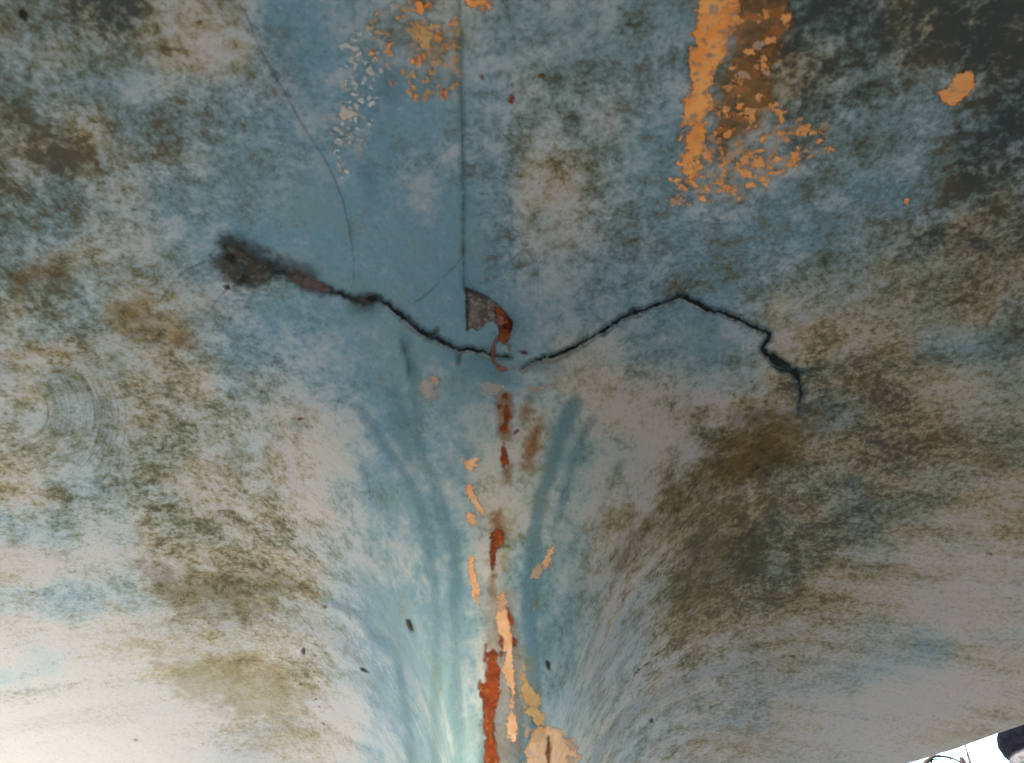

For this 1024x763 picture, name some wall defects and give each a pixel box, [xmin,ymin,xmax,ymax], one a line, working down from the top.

peeling [328,0,492,179]
peeling [669,0,836,207]
peeling [936,71,976,106]
damp [213,237,301,289]
spalling [464,288,513,344]
crack [331,291,817,412]
corrosion [497,393,538,478]
corrosion [489,514,504,570]
corrosion [478,644,500,763]